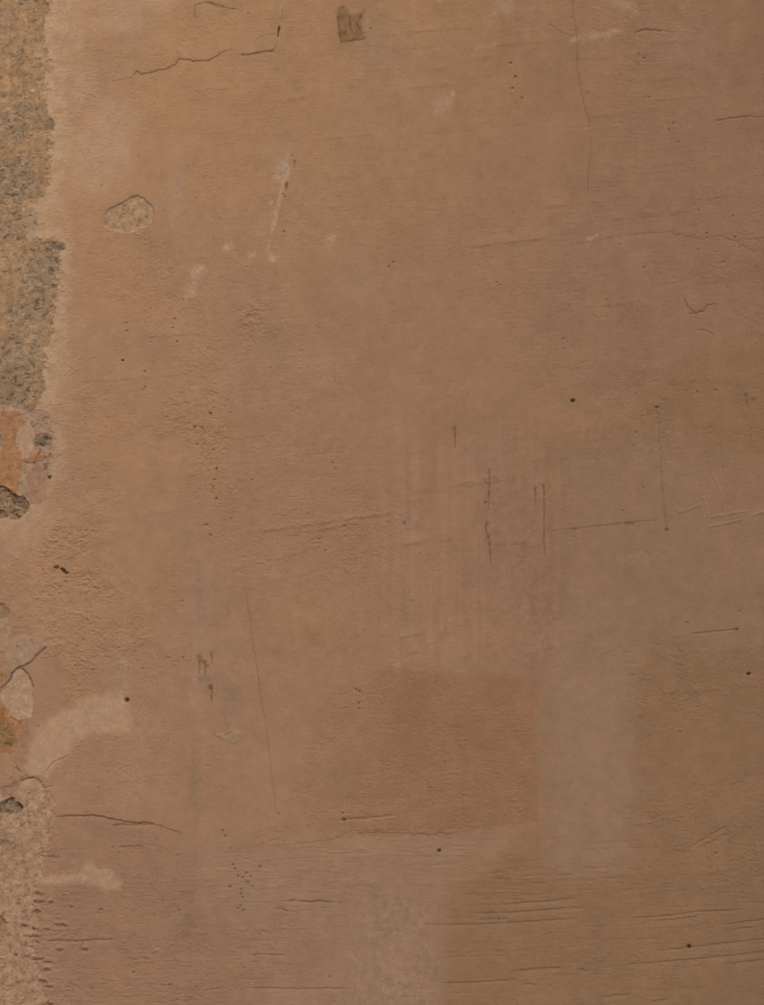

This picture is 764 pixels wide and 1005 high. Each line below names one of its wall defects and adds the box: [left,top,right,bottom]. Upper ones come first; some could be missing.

crack [194,2,241,19]
crack [112,33,276,83]
flaking render [0,0,66,521]
crack [0,647,47,690]
flaking render [0,652,67,1005]
crack [56,814,182,835]